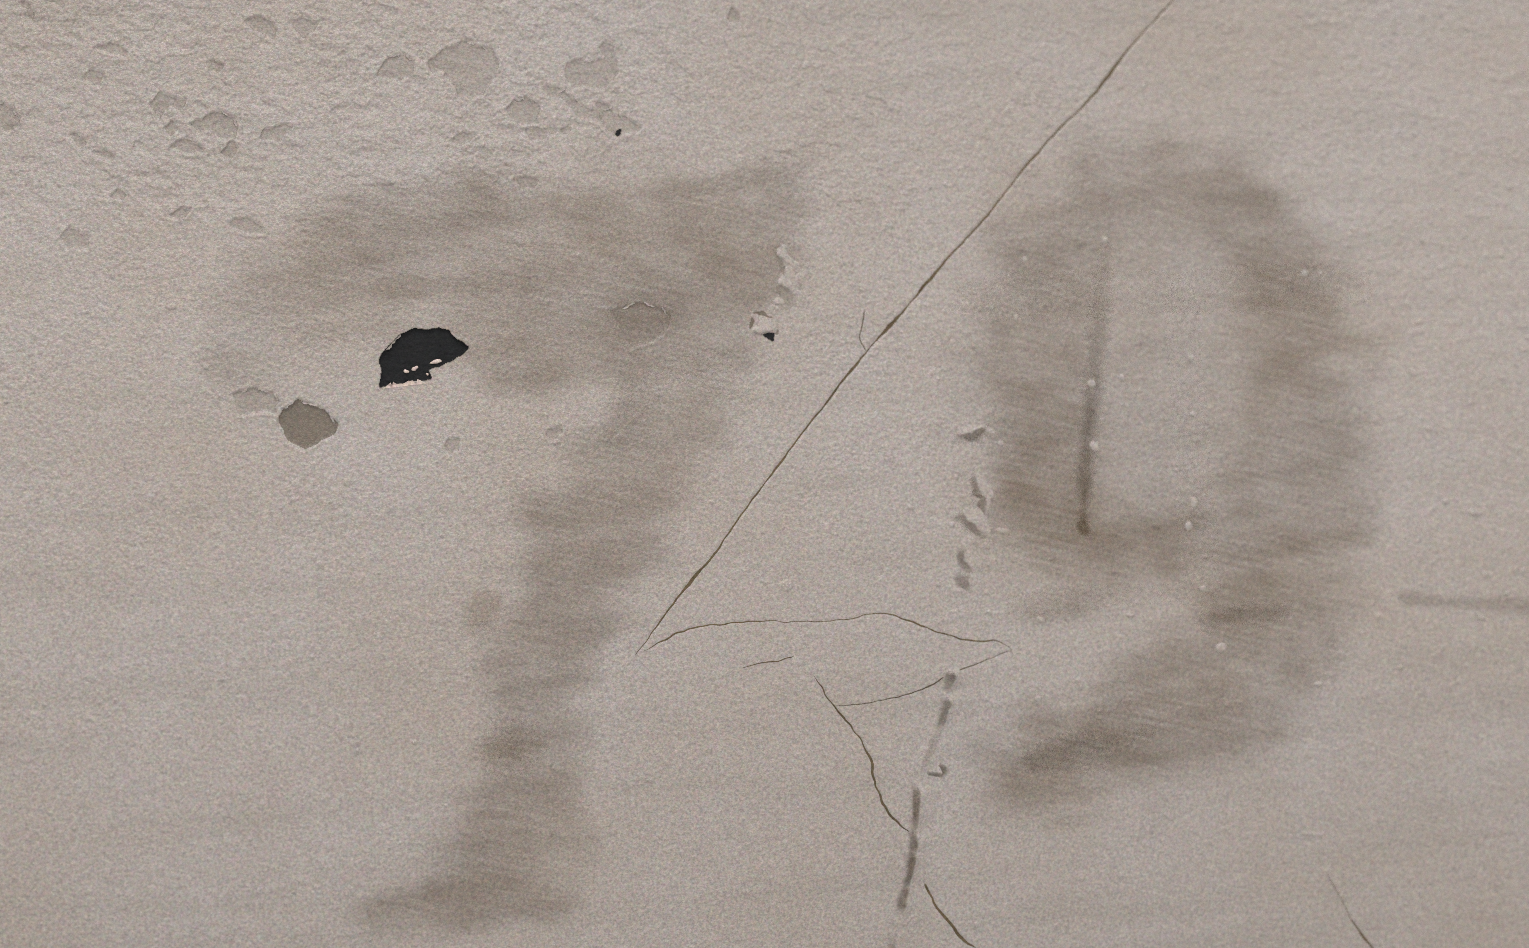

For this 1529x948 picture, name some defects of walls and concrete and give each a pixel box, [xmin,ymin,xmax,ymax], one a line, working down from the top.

peeling [610,300,671,347]
spalling [379,327,469,389]
peeling [233,386,338,449]
crack [636,0,1173,832]
crack [924,884,976,948]
crack [1328,875,1373,948]